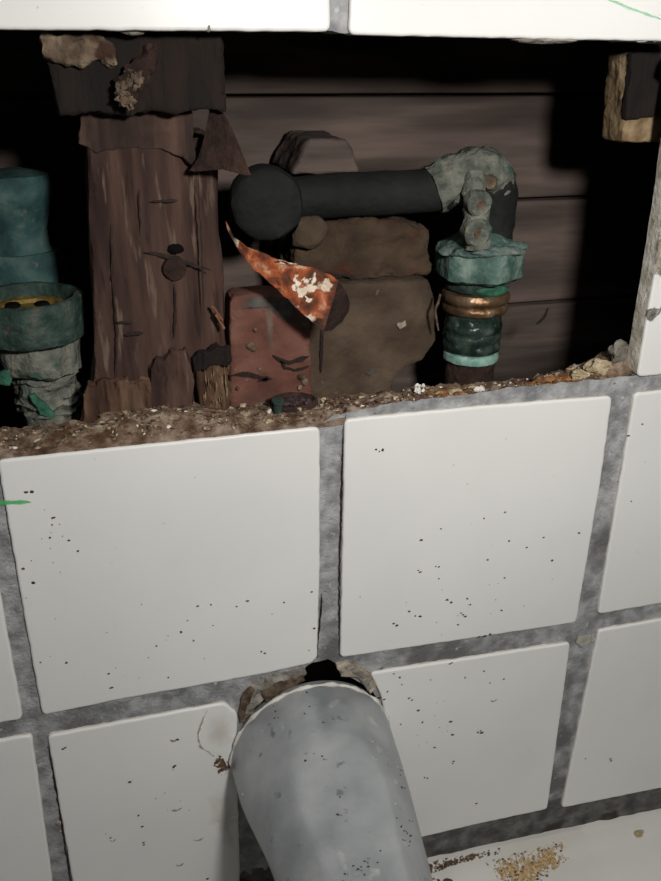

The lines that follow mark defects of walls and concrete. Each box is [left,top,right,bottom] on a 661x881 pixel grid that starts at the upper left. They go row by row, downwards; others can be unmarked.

spalling [647,308,661,321]
spalling [0,351,631,460]
peeling [238,677,305,723]